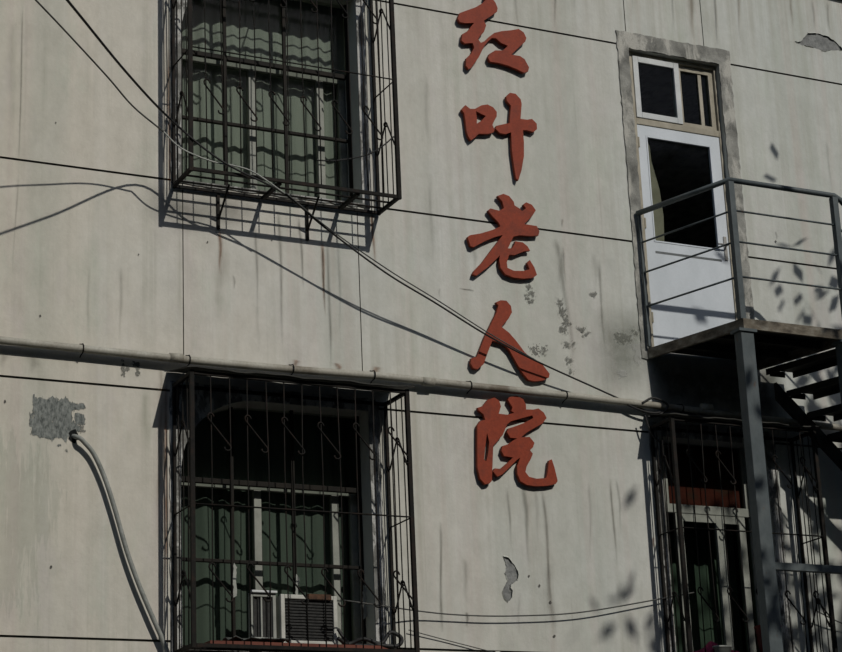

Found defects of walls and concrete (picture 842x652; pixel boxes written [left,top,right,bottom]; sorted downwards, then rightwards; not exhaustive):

spalling [795,32,842,52]
peeling [555,299,591,375]
peeling [121,359,140,377]
peeling [57,403,86,452]
spalling [502,555,530,603]